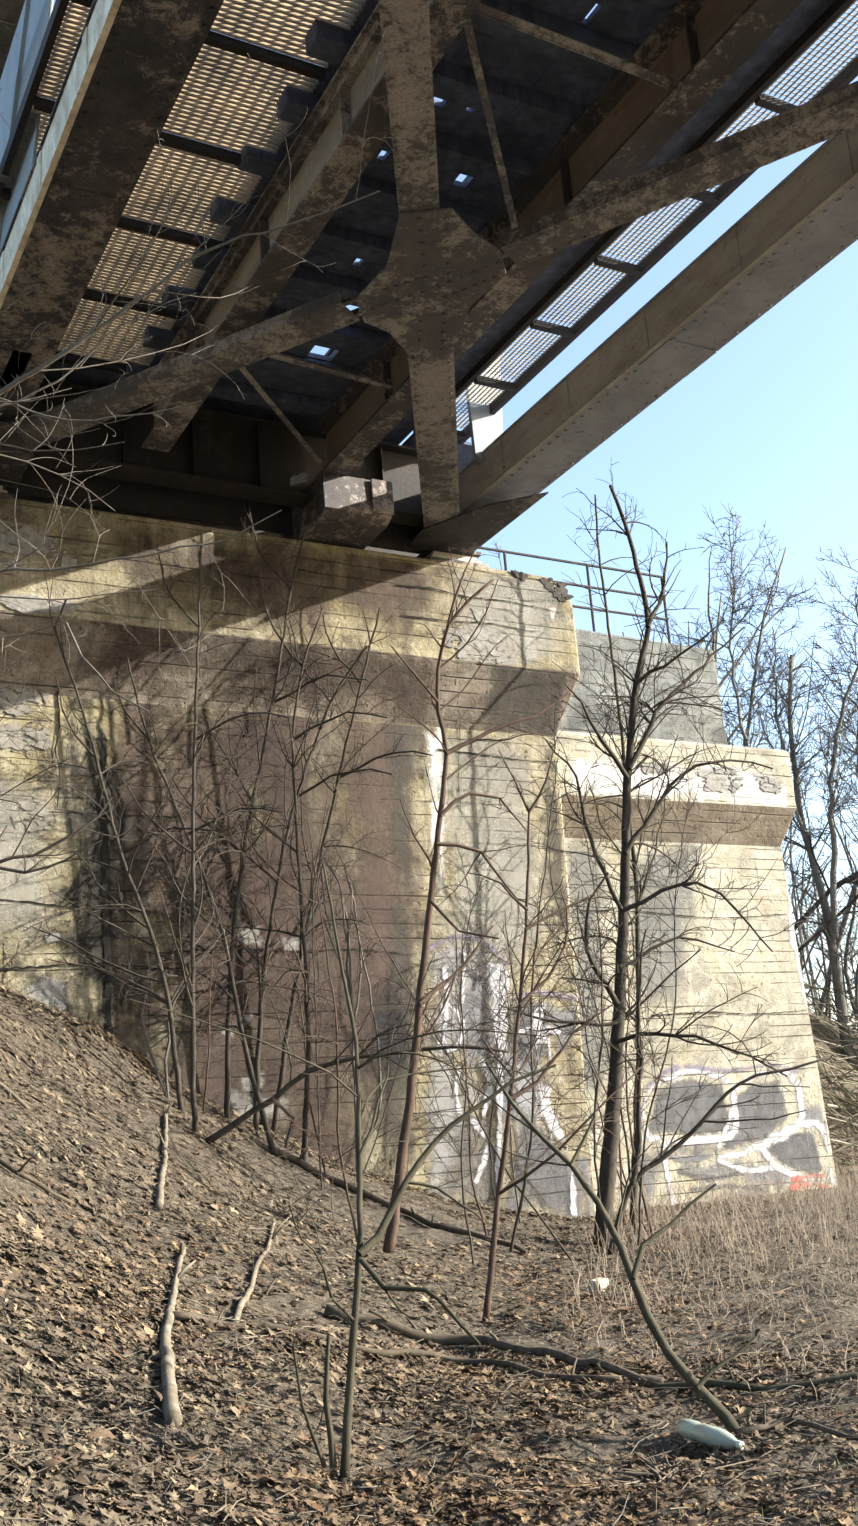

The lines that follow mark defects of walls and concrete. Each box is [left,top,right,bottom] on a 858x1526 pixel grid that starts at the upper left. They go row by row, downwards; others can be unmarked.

spalling [642,762,670,774]
damp [570,757,788,807]
spalling [698,768,783,794]
damp [0,536,605,1172]
damp [631,852,694,1001]